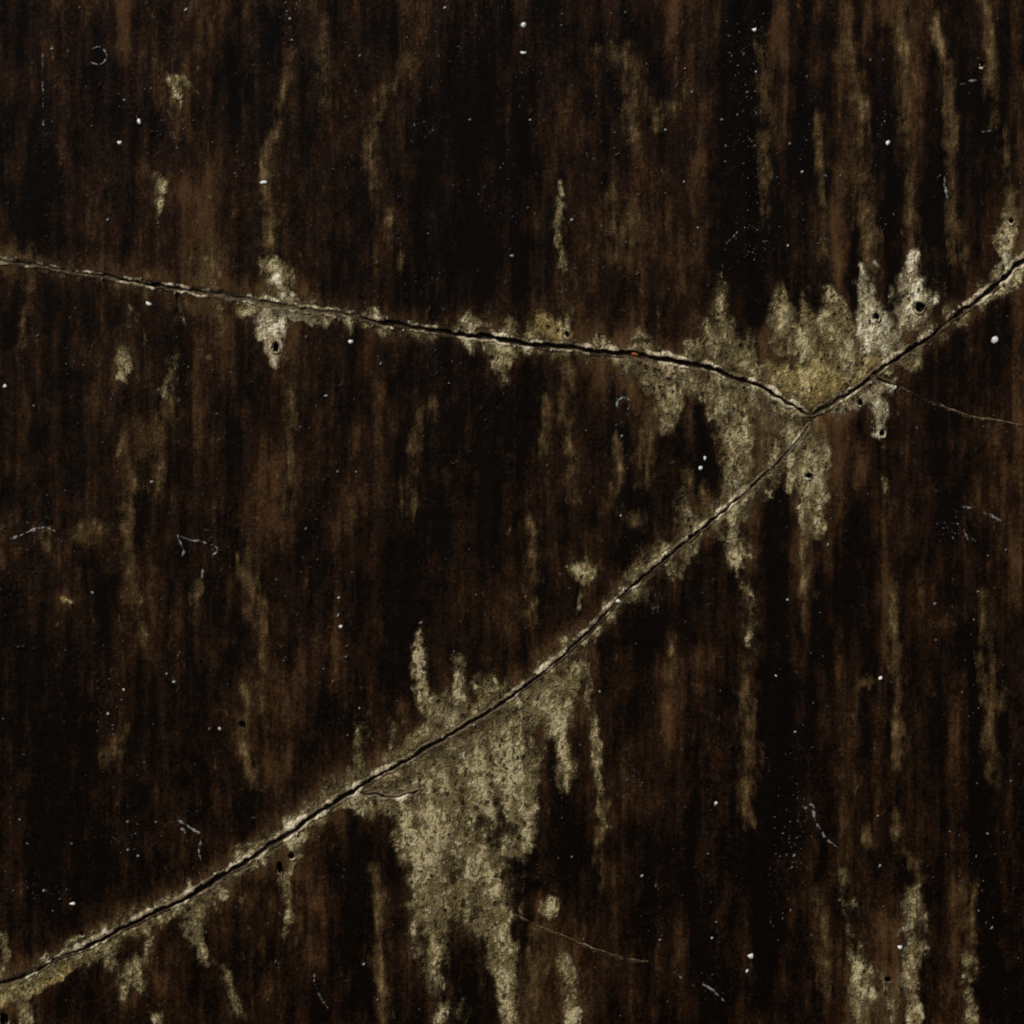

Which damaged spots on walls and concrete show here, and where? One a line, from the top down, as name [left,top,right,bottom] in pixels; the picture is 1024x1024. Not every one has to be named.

leakage [814,111,827,216]
crack [0,251,1024,993]
leakage [581,650,611,865]
leakage [370,866,388,1024]